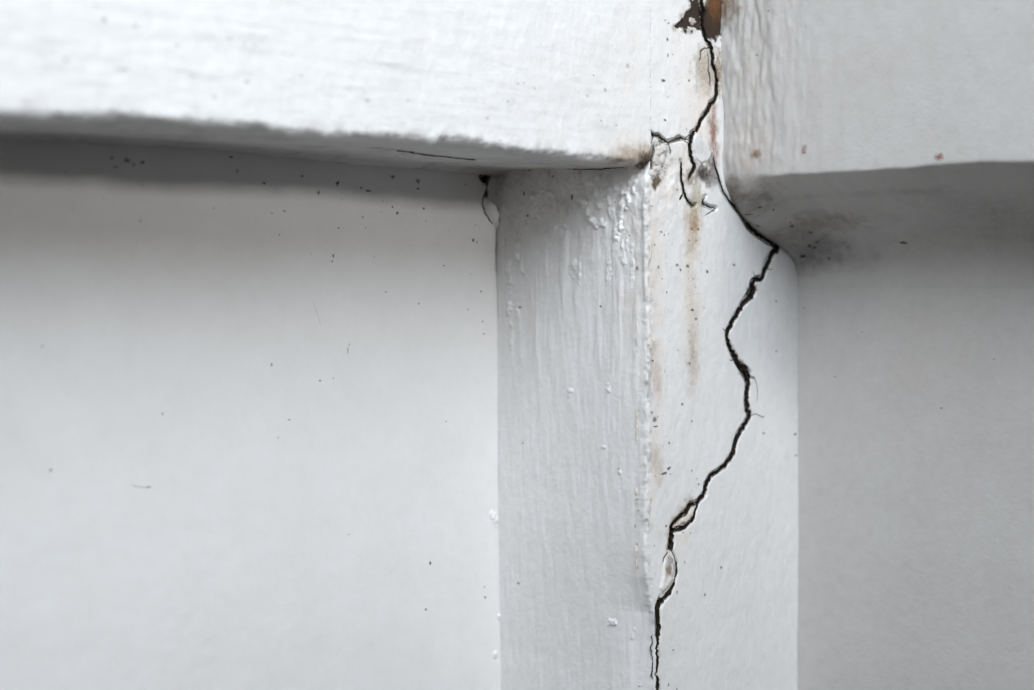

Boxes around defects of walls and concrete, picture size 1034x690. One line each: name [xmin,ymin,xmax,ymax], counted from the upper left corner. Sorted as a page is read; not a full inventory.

spalling [675,0,732,42]
crack [650,0,779,690]